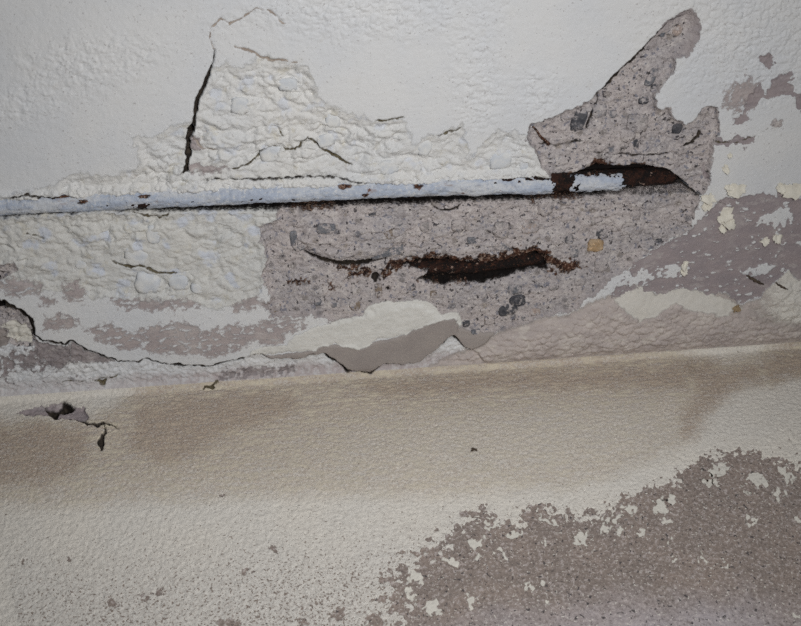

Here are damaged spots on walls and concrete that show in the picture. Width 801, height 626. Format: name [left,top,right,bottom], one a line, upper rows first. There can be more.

crack [182,7,378,185]
crack [11,192,74,200]
spalling [0,8,801,384]
crack [113,261,176,274]
corrosion [332,262,372,283]
crack [2,299,265,390]
crack [325,353,386,374]
damp [0,342,801,494]
crack [76,420,115,450]
peeling [244,445,801,626]
peeling [205,616,242,626]